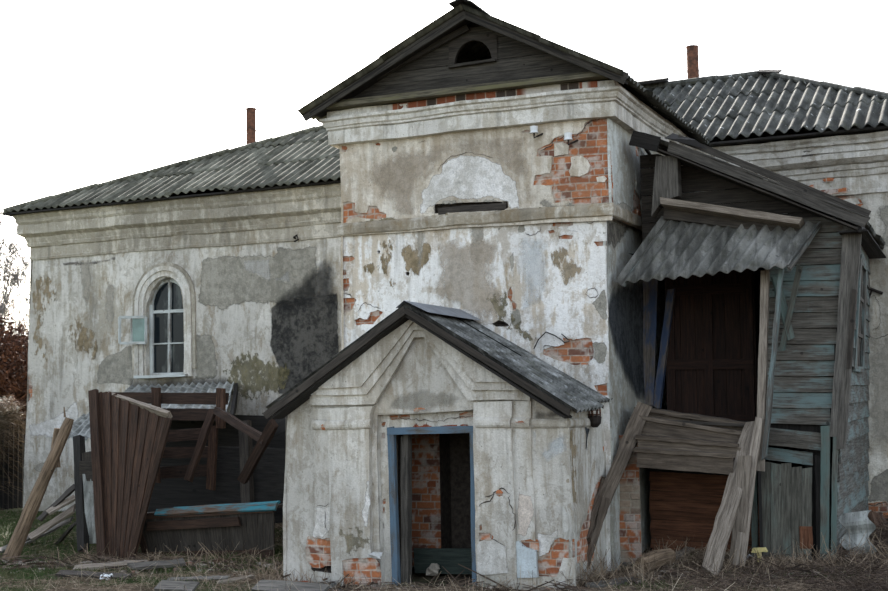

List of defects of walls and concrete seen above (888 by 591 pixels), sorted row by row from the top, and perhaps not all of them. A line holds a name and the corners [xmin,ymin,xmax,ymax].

spalling [343,201,386,223]
spalling [534,119,613,205]
spalling [810,177,863,207]
leakage [364,231,431,287]
leakage [436,227,501,314]
leakage [32,277,57,361]
leakage [68,320,98,360]
spalling [543,337,594,365]
spalling [306,504,331,573]
flaking render [329,476,711,591]